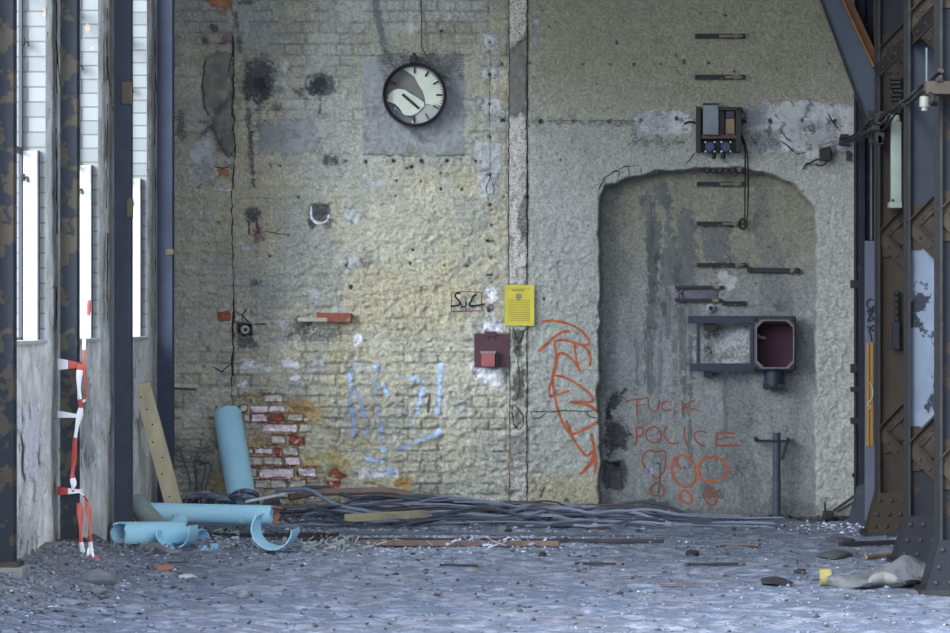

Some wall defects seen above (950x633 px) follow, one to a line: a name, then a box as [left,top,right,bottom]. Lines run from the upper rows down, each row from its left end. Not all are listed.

crack [211,33,248,399]
crack [598,165,642,191]
peeling [188,308,325,388]
peeling [306,288,349,313]
damp [603,182,734,468]
flaking render [239,389,399,499]
flaking render [602,459,628,491]